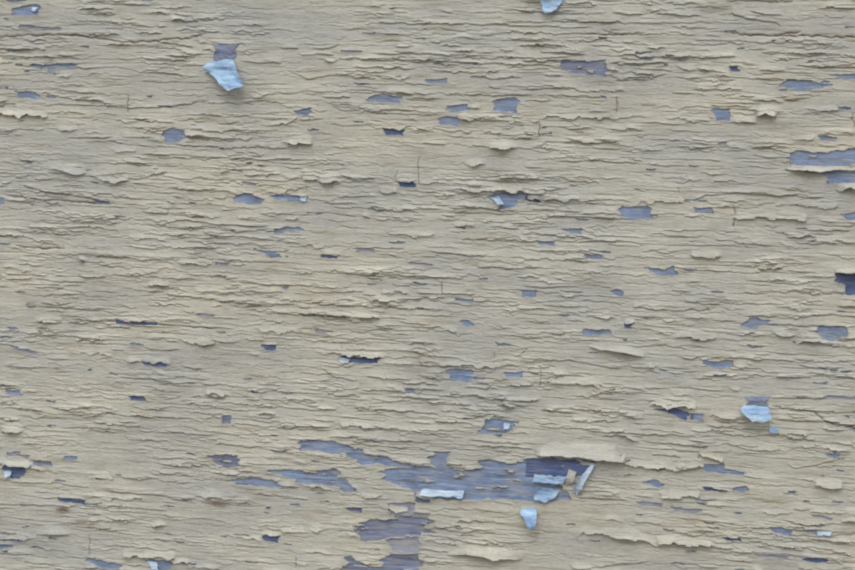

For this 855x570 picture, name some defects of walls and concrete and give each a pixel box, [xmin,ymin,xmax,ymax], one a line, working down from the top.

peeling [540,0,564,13]
peeling [195,37,267,98]
peeling [561,60,620,78]
peeling [0,90,56,118]
peeling [786,125,855,192]
peeling [441,180,580,210]
peeling [734,208,855,222]
peeling [835,269,855,295]
peeling [477,400,519,436]
peeling [729,384,778,433]
peeling [58,492,142,505]
peeling [207,439,749,570]